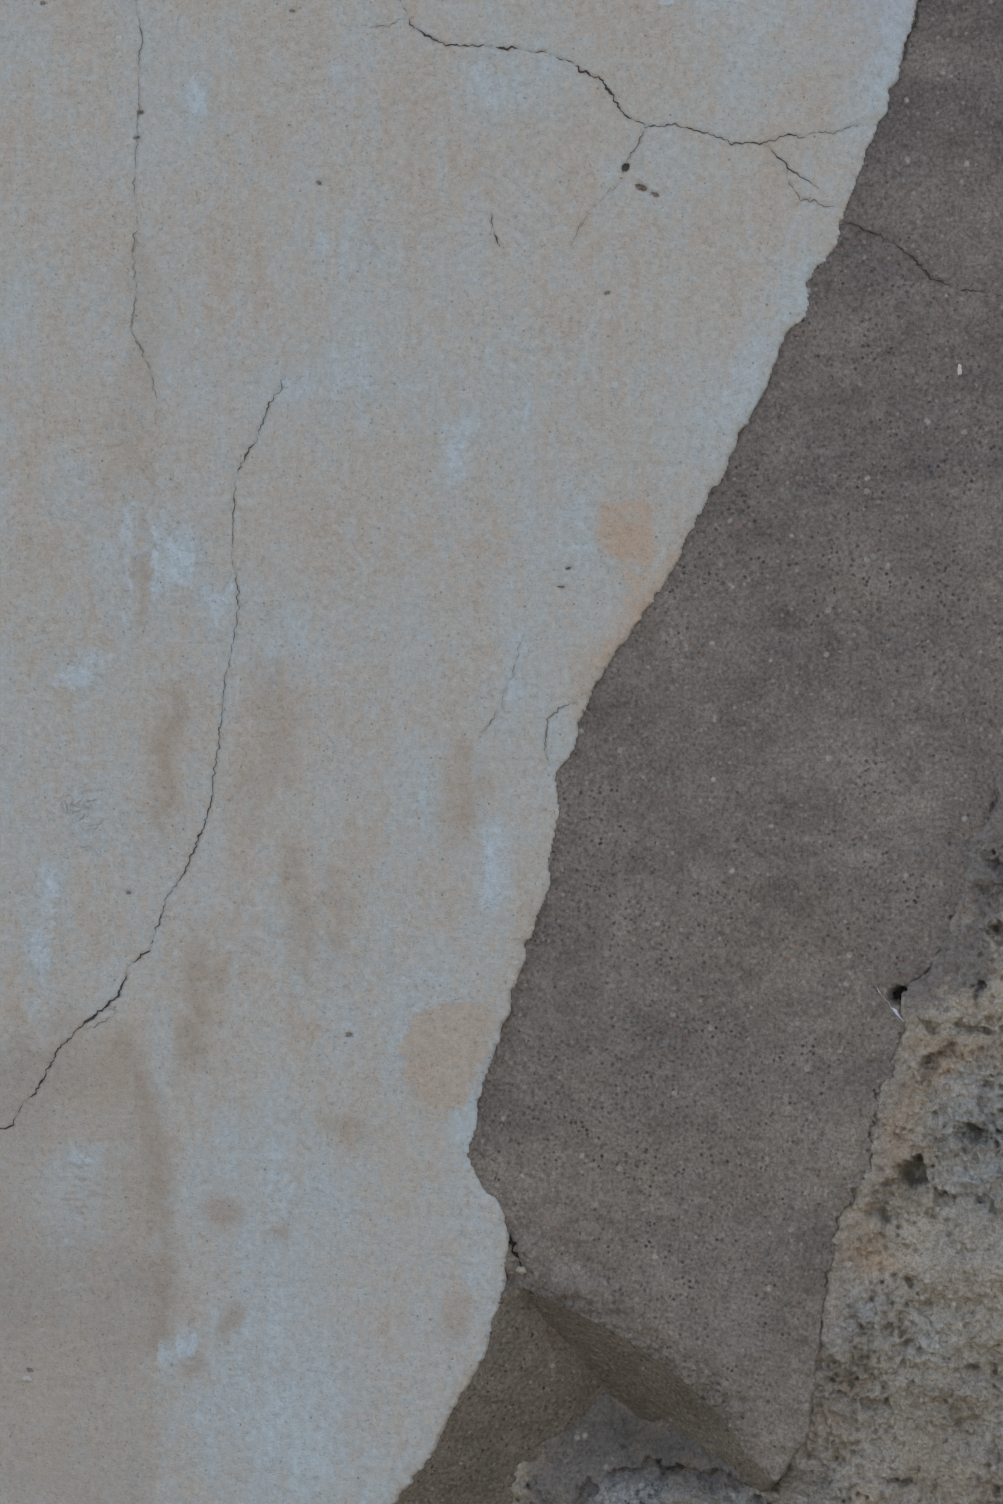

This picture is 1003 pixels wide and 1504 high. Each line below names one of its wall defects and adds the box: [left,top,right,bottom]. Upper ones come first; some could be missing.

spalling [622,163,659,197]
crack [371,0,1001,296]
crack [0,379,283,1129]
spalling [877,987,907,1021]
spalling [395,1283,777,1504]